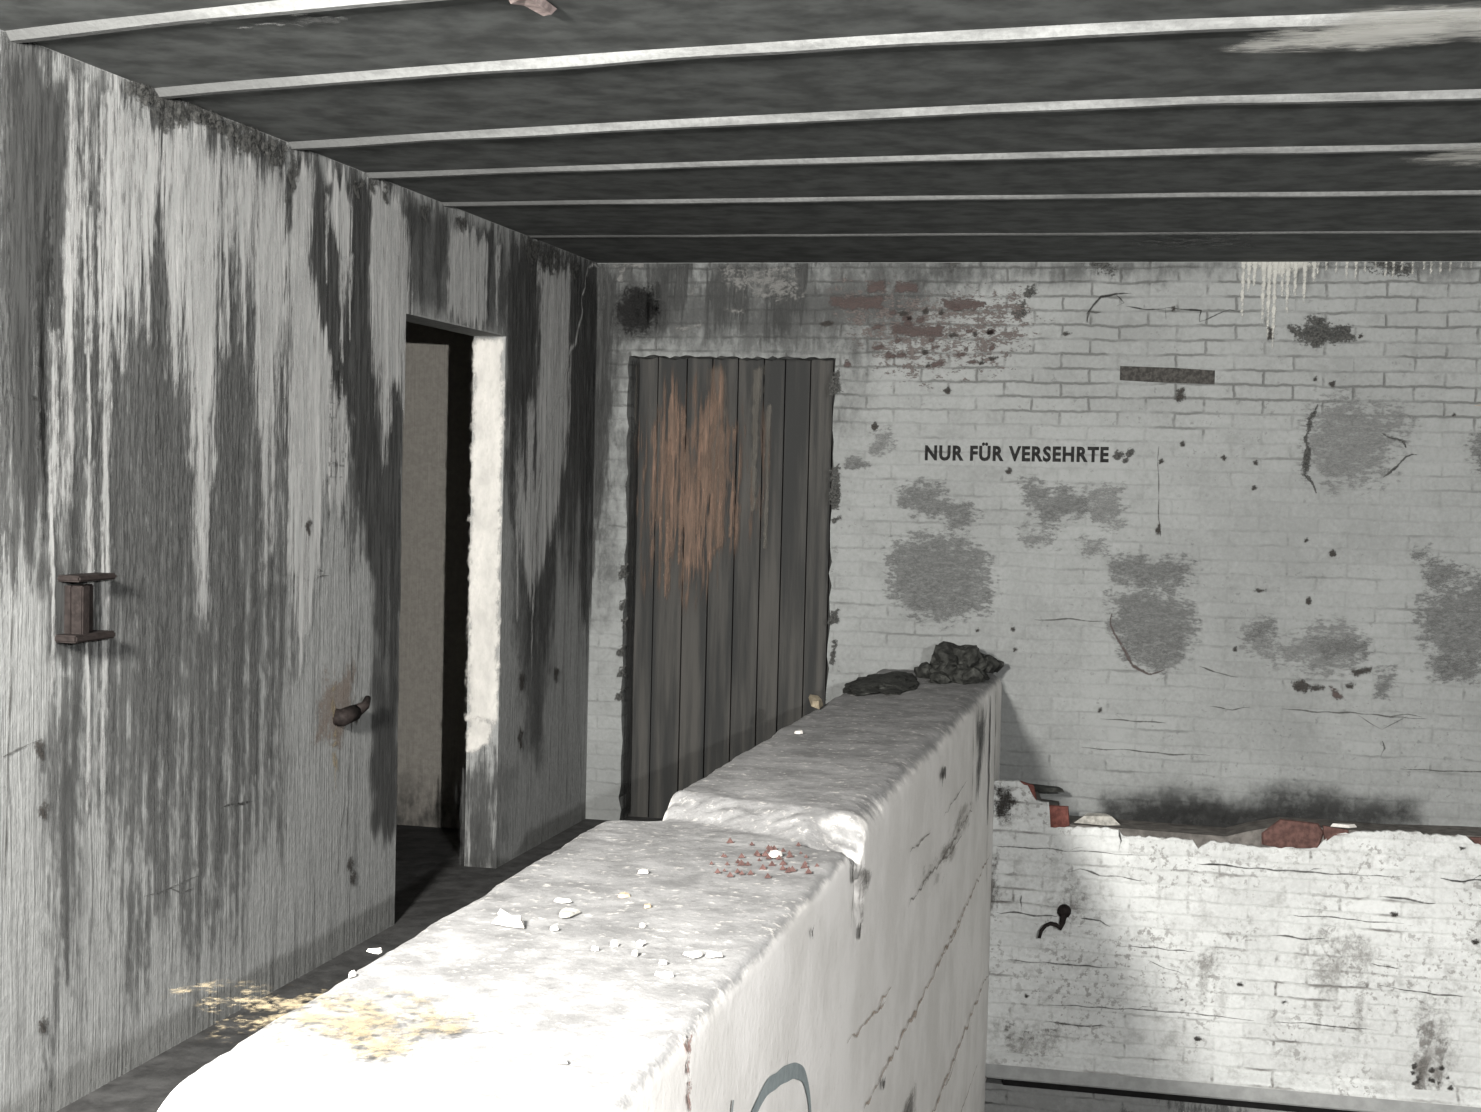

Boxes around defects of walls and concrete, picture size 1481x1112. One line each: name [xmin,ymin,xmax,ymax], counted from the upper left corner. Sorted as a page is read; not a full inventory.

water stain [0,59,619,951]
rust [636,370,757,604]
crack [854,707,1210,1112]
flaking render [1020,781,1070,828]
flaking render [1261,819,1349,848]